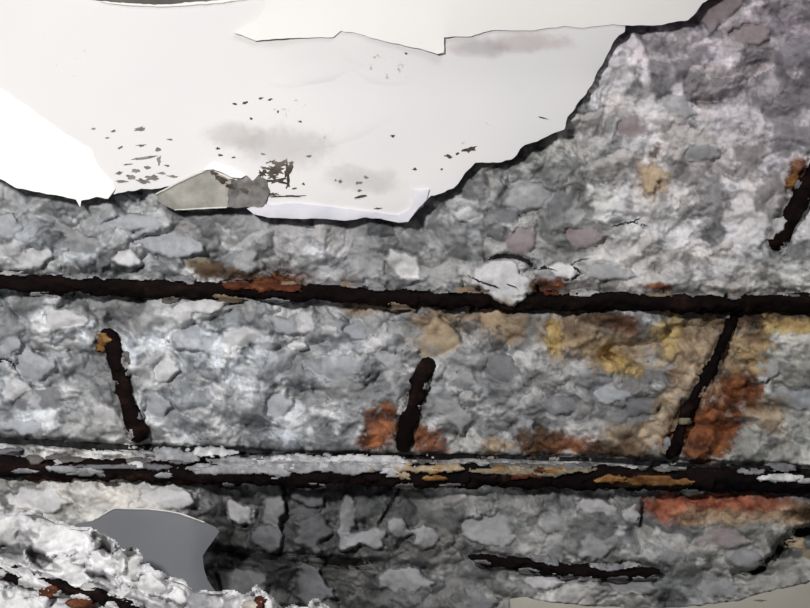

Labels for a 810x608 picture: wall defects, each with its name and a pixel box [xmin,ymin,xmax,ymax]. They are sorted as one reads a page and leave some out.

spalling [0,0,810,307]
corrosion [785,159,806,181]
corrosion [194,261,310,284]
corrosion [528,278,566,294]
corrosion [644,282,672,291]
corrosion [344,304,382,315]
corrosion [413,303,526,343]
corrosion [483,310,810,463]
corrosion [356,400,399,454]
spalling [0,270,810,608]
corrosion [411,424,447,455]
corrosion [641,491,810,525]